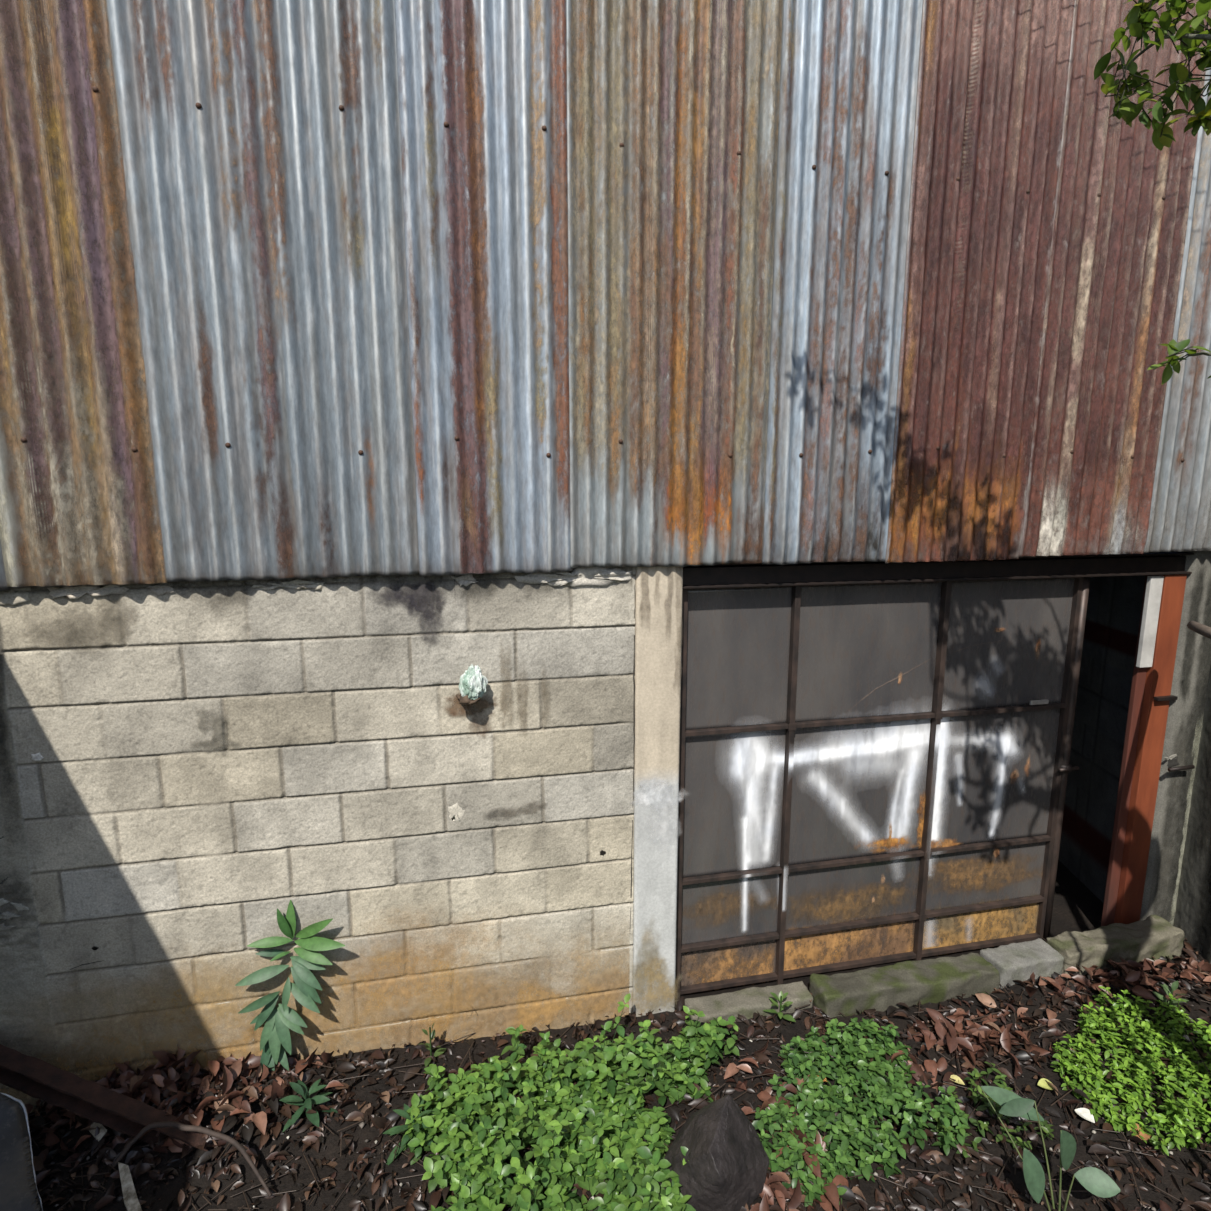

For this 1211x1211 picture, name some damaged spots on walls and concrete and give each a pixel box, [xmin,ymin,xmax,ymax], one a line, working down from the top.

corrosion [0,0,165,587]
corrosion [205,0,287,460]
corrosion [426,0,502,574]
corrosion [530,0,794,563]
corrosion [800,0,1211,562]
spalling [0,898,30,931]
leakage [140,577,347,603]
leakage [43,951,676,1081]
leakage [368,575,445,633]
leakage [463,572,554,594]
corrosion [680,878,1038,992]
leakage [1154,573,1211,960]